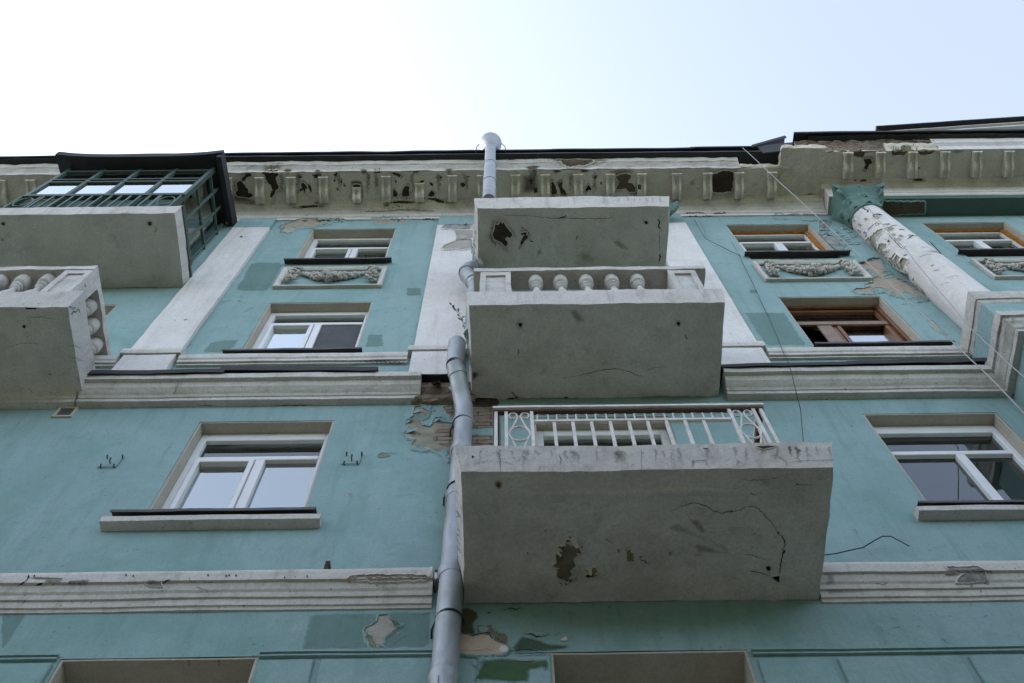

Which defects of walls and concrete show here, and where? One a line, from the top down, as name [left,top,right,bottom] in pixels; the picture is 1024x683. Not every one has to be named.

peeling [234,166,347,234]
spalling [615,171,641,194]
spalling [712,170,735,194]
spalling [490,220,533,248]
peeling [772,199,930,305]
peeling [401,381,455,464]
crack [671,454,833,584]
peeling [551,536,599,586]
peeling [944,565,991,587]
peeling [362,614,404,649]
peeling [459,632,512,659]